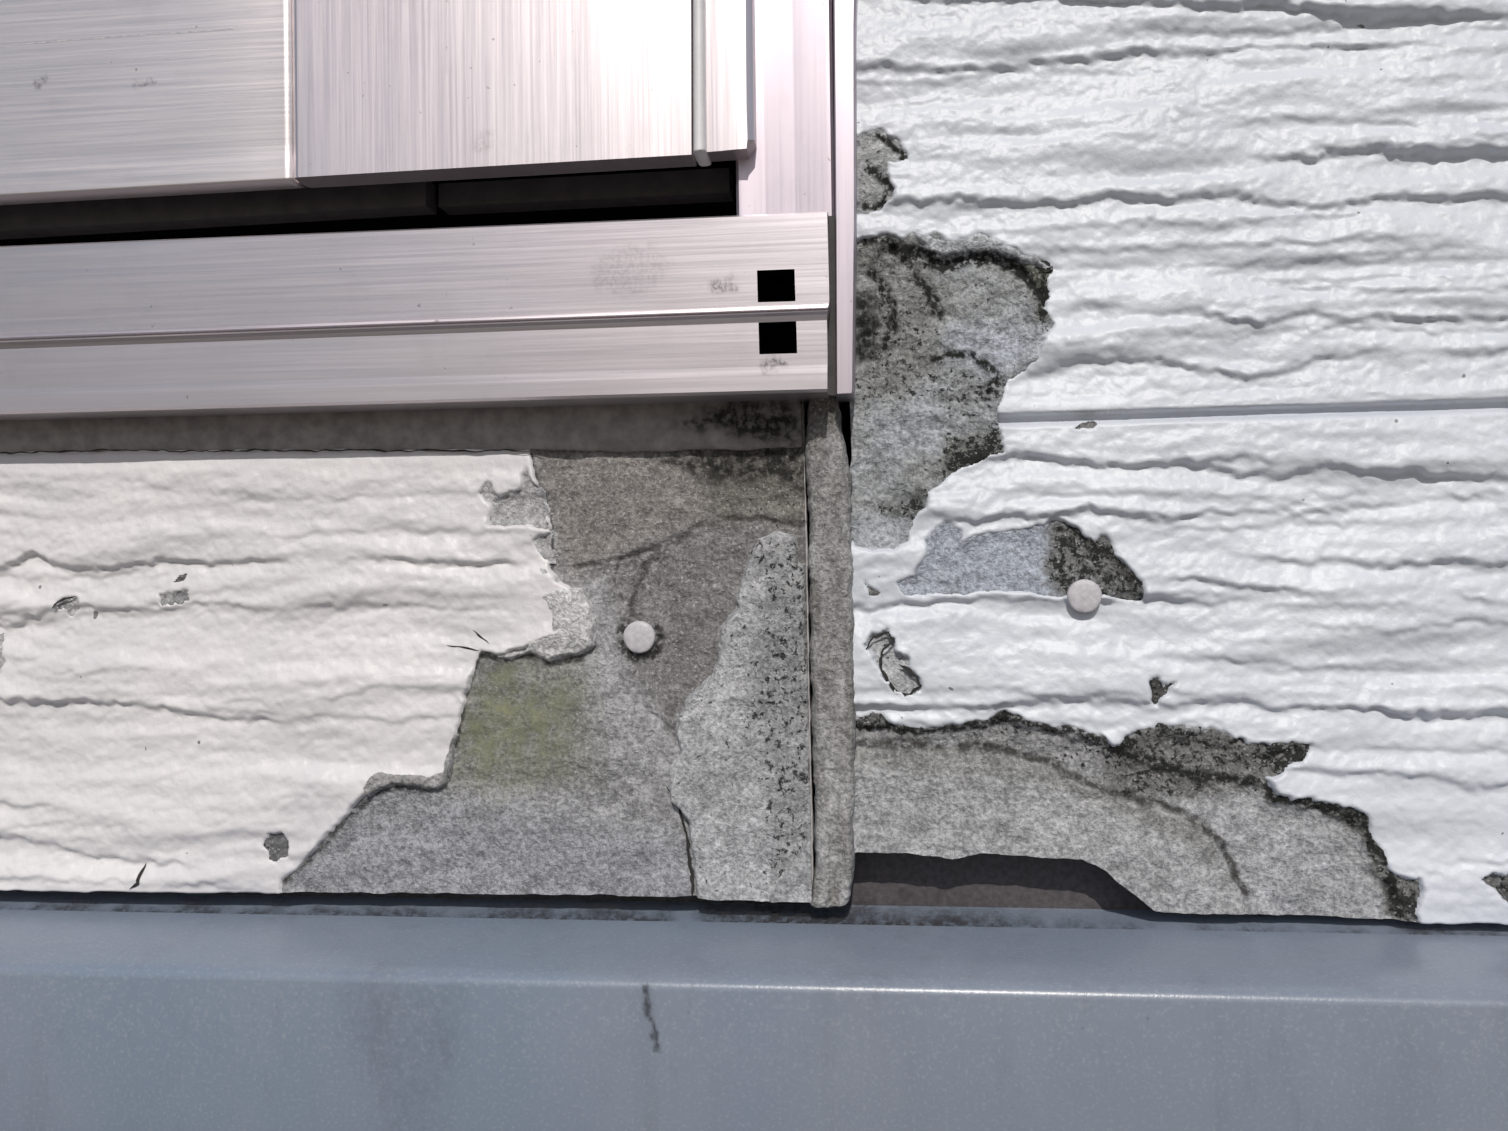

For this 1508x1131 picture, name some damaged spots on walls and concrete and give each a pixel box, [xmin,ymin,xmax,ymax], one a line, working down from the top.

spalling [857,129,908,215]
spalling [850,231,1144,601]
peeling [263,401,812,903]
peeling [866,631,922,697]
peeling [1149,678,1172,704]
spalling [853,710,1420,922]
peeling [1482,873,1508,902]